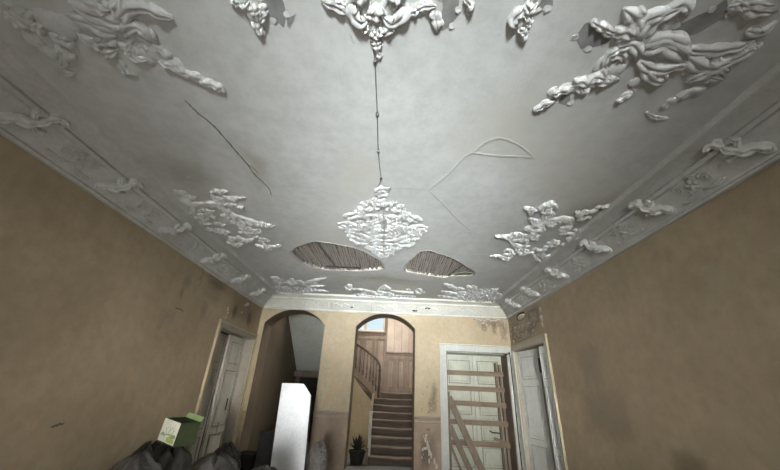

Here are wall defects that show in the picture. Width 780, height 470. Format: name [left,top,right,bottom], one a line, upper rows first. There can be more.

crack [185,100,273,195]
spalling [289,241,385,272]
spalling [403,250,476,279]